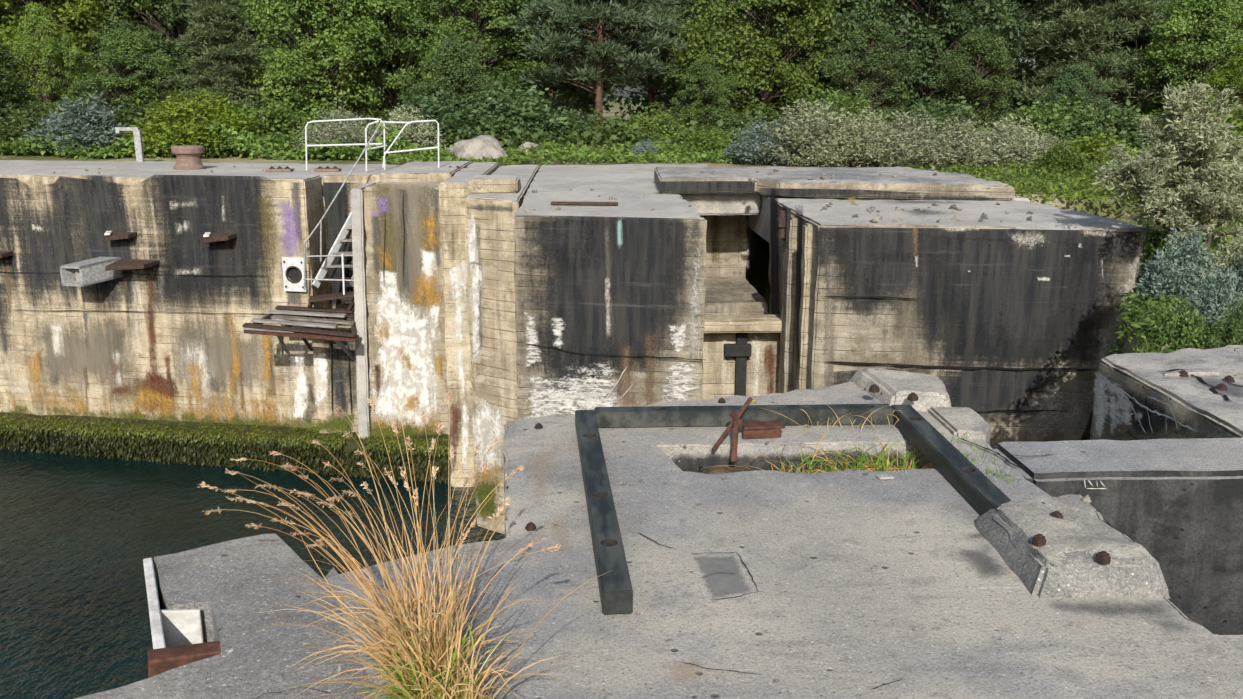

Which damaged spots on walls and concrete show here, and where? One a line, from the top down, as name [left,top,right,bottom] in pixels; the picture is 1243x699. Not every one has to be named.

damp [0,175,275,396]
corrosion [112,275,273,419]
peeling [373,271,441,430]
corrosion [410,276,441,331]
peeling [422,251,436,282]
damp [522,215,718,410]
damp [653,181,1141,434]